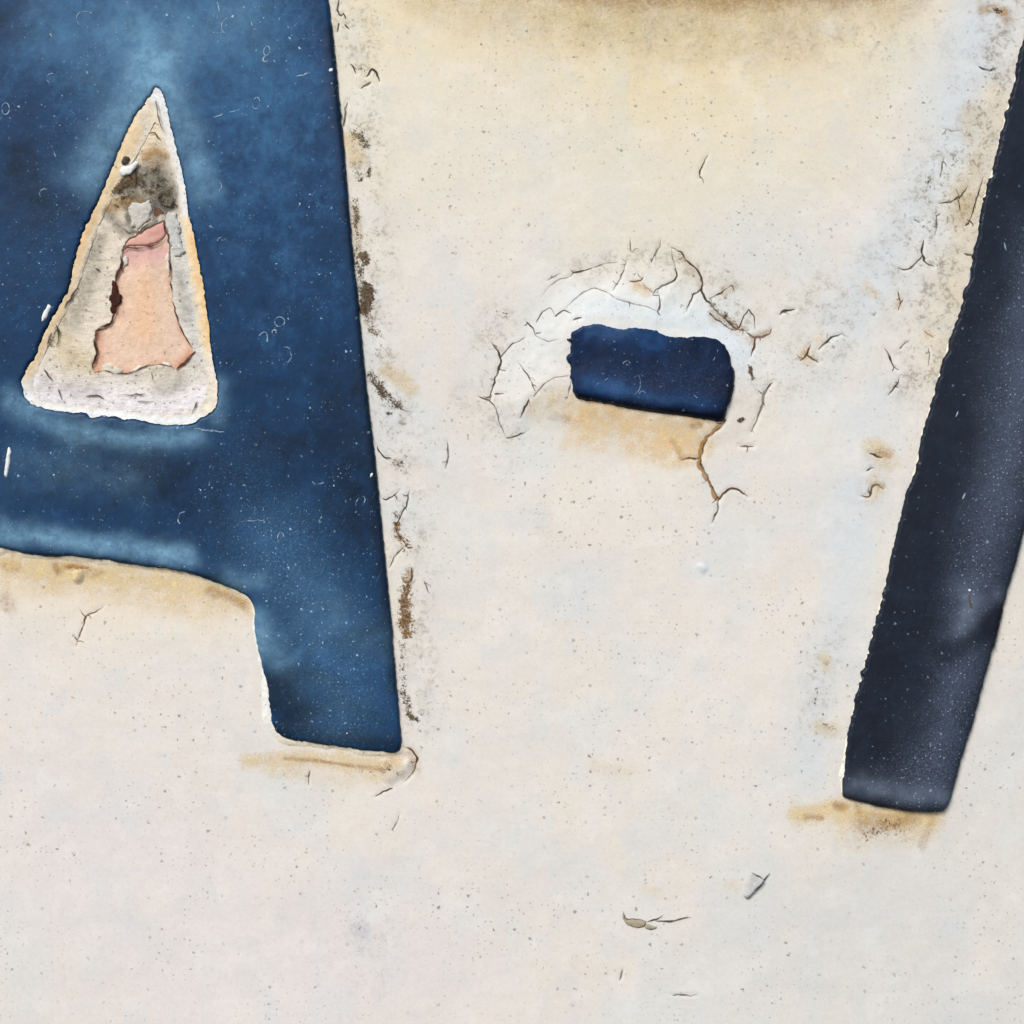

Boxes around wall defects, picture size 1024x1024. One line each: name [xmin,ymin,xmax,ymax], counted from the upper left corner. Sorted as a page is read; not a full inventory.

peeling [21,88,218,425]
crack [896,178,983,310]
crack [478,243,794,439]
crack [886,331,934,395]
corrosion [567,402,705,461]
crack [741,382,773,451]
crack [685,419,746,518]
crack [860,453,883,497]
corrosion [790,802,939,841]
peeling [622,912,688,930]